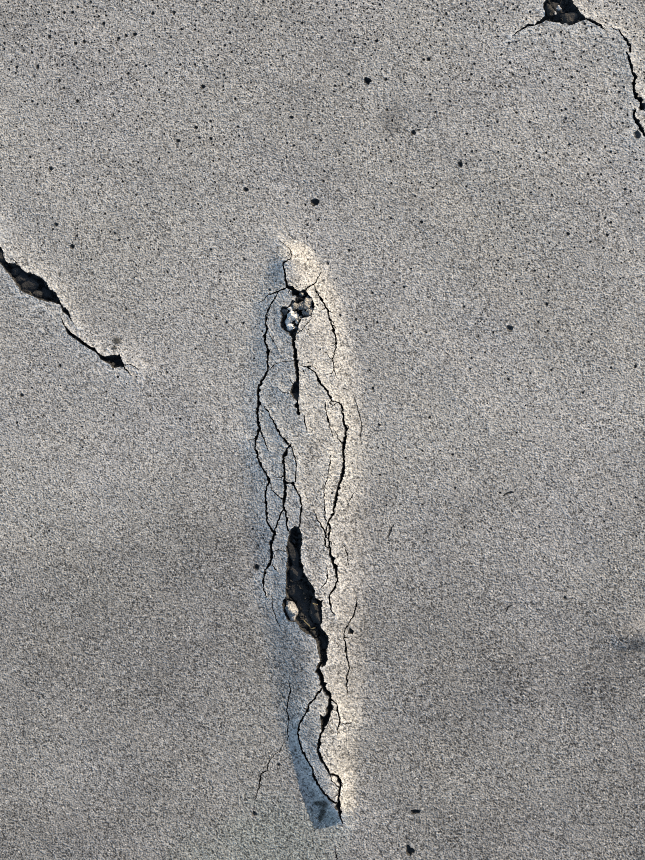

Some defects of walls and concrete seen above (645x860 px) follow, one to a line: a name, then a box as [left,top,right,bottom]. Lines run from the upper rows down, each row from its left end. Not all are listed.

crack [610,26,645,139]
crack [60,316,139,376]
crack [249,239,362,824]
spalling [282,526,329,667]